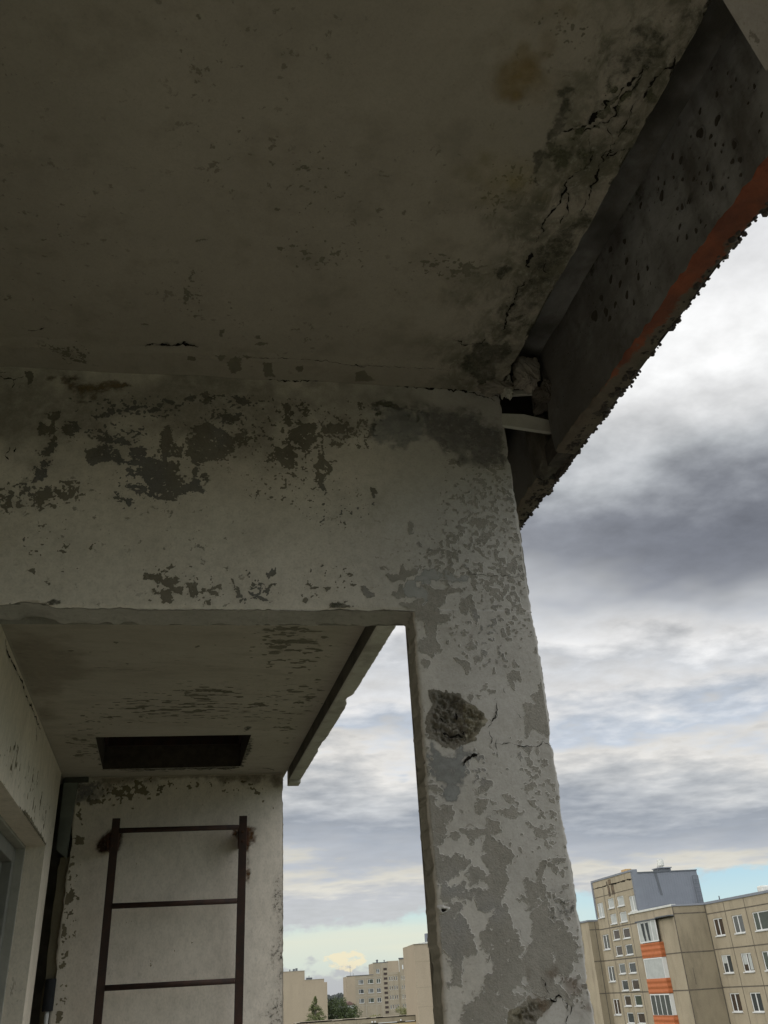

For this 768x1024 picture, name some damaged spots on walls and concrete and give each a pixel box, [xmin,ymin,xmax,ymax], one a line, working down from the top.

water stain [533,27,664,182]
crack [453,40,689,346]
crack [145,340,196,348]
peeling [0,391,378,532]
peeling [137,564,279,605]
peeling [301,564,375,603]
peeling [80,626,339,744]
peeling [385,446,591,1024]
crack [463,703,551,766]
peeling [57,777,274,970]